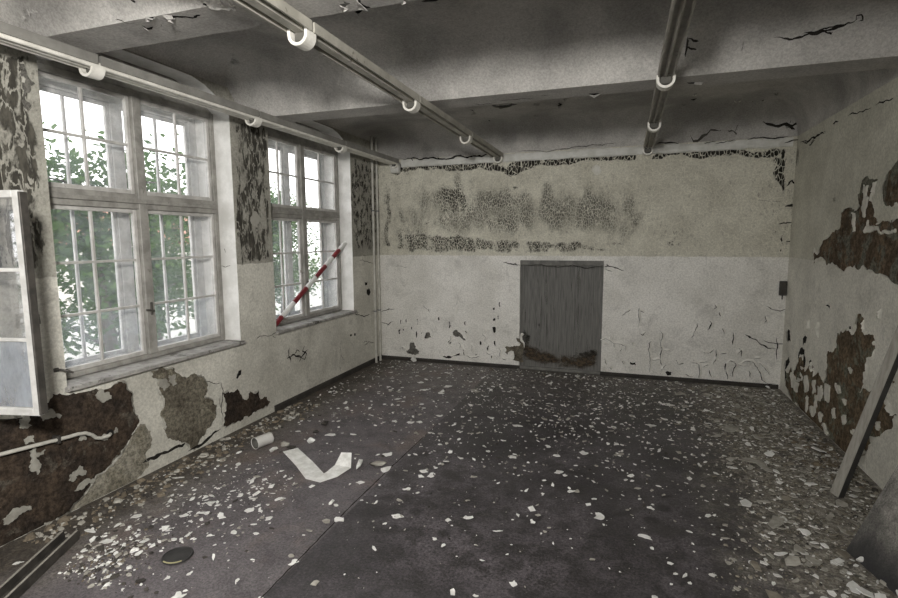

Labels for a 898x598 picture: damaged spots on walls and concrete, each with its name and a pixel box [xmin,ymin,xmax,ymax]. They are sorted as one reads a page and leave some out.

crack [773,14,864,41]
peeling [0,55,45,269]
peeling [236,124,269,264]
water stain [442,189,467,214]
water stain [385,194,585,252]
peeling [397,155,636,232]
crack [657,98,893,146]
flaking render [813,161,898,285]
flaking render [0,380,152,547]
crack [143,381,224,463]
flaking render [150,367,270,451]
flaking render [784,314,875,453]